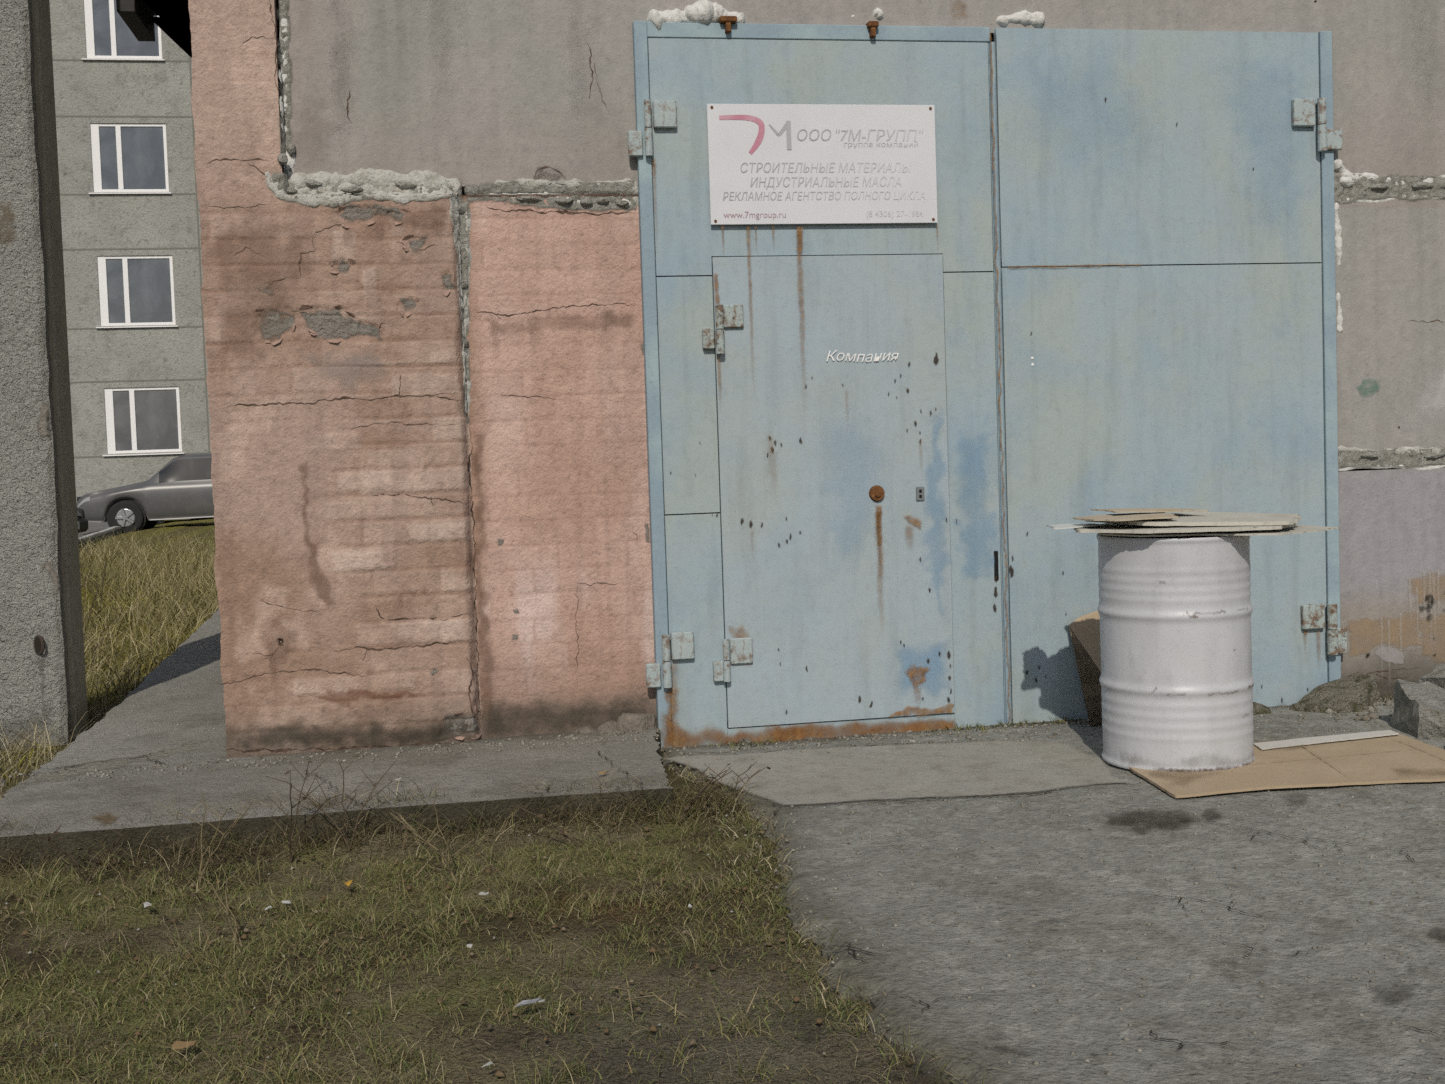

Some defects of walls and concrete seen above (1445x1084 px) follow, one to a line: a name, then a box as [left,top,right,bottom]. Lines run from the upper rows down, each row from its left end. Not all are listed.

spalling [338,203,425,251]
spalling [255,281,381,345]
crack [4,375,482,810]
rust [908,668,928,686]
rust [665,691,954,748]